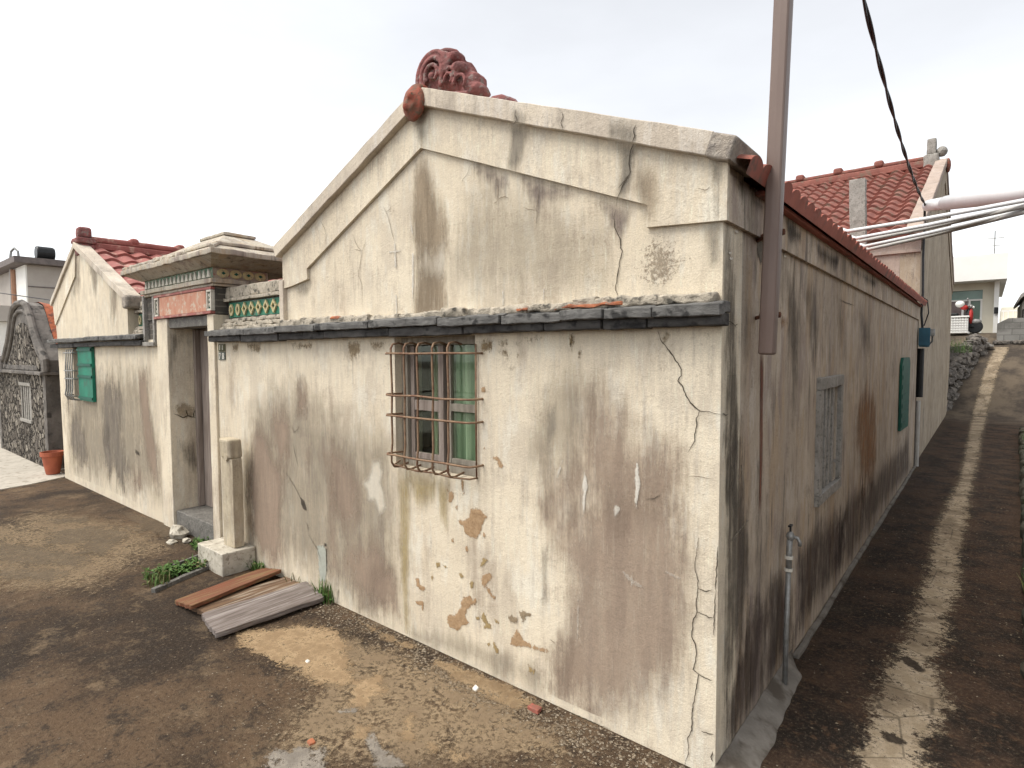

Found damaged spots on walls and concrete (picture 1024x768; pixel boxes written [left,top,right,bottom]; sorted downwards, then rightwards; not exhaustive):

leakage [414,168,446,256]
crack [614,125,636,295]
leakage [416,270,443,313]
leakage [67,379,157,490]
leakage [252,389,447,607]
flaking render [364,462,384,513]
peeling [447,480,487,552]
peeling [447,558,547,653]
leakage [545,400,685,705]
crack [658,332,726,479]
crack [685,538,718,762]
leakage [726,293,785,740]